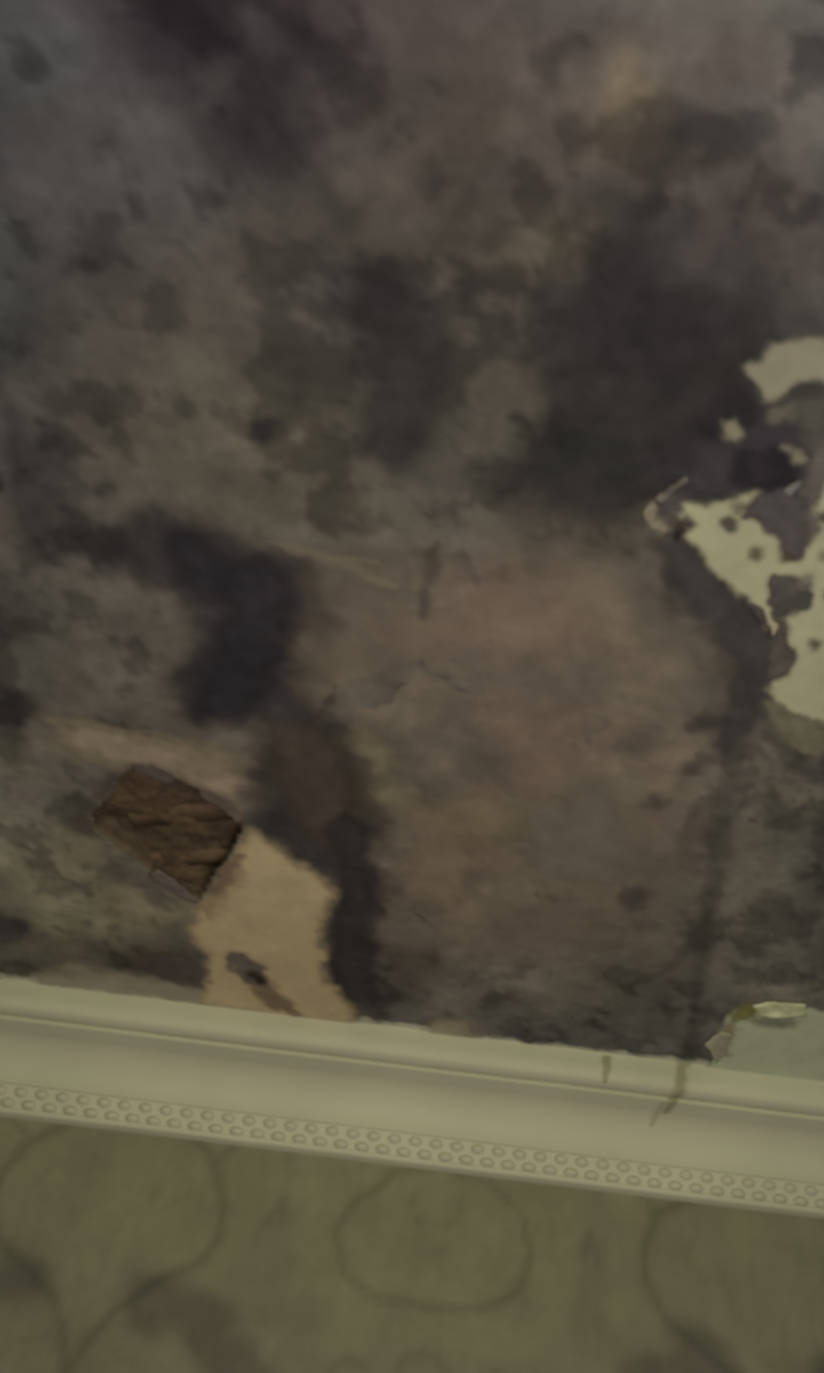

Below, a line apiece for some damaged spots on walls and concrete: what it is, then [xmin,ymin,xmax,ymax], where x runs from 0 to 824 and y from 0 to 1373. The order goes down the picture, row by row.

damp [0,0,824,1061]
peeling [643,476,824,755]
peeling [725,422,743,440]
peeling [745,337,824,401]
peeling [55,722,354,1022]
peeling [705,1002,824,1082]